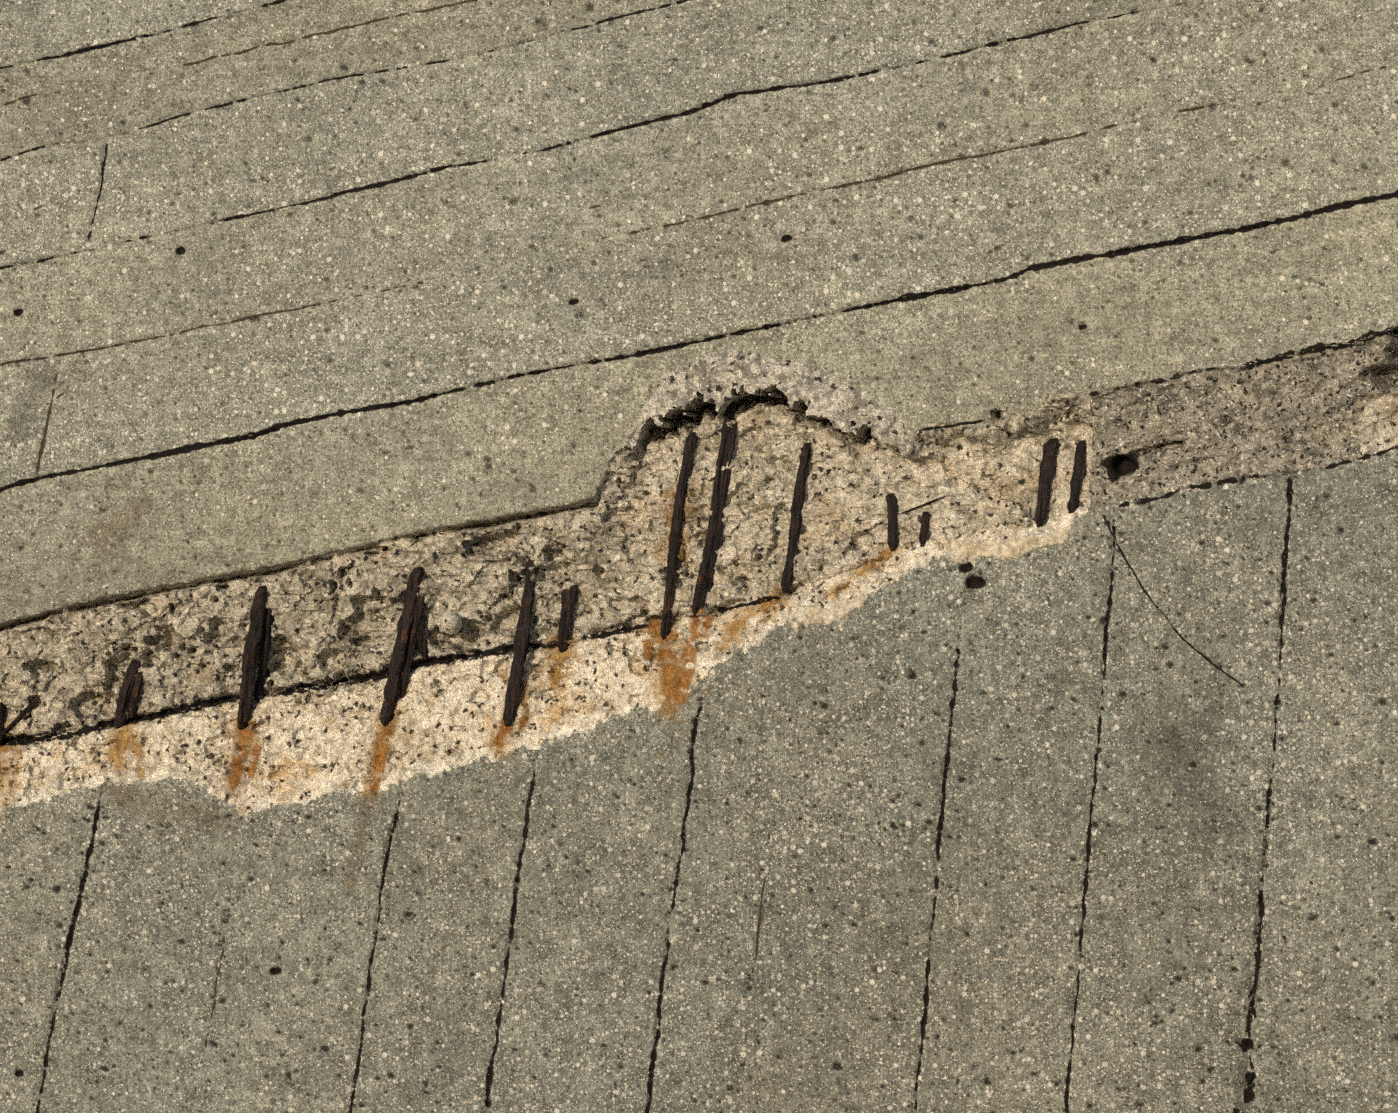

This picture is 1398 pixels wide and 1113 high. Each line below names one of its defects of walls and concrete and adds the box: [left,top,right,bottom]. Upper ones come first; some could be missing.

crack [522,10,1143,154]
crack [0,190,1398,492]
spalling [1339,382,1398,454]
corrosion [110,722,144,777]
corrosion [228,721,261,789]
corrosion [364,720,395,795]
corrosion [494,672,529,749]
spalling [0,386,1139,816]
corrosion [643,595,780,715]
crack [1064,445,1398,1113]
crack [645,705,702,1113]
crack [913,648,960,1109]